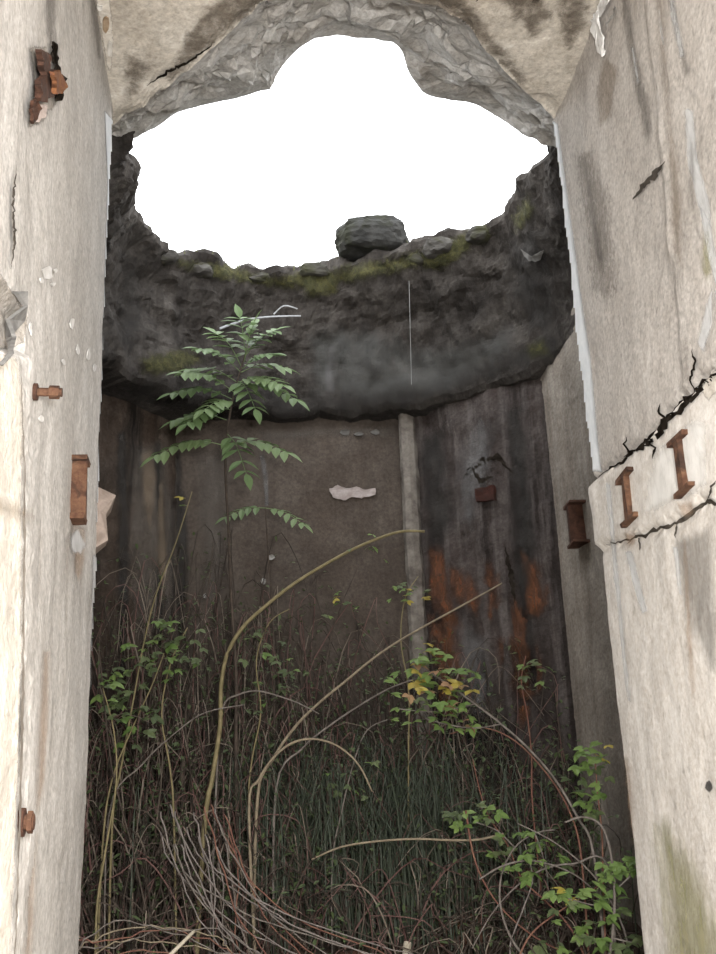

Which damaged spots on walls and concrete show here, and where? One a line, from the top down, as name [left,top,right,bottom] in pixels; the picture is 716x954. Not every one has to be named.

damp [126,61,146,92]
crack [147,42,215,86]
damp [178,0,268,63]
damp [418,0,520,80]
damp [507,0,587,42]
peeling [590,0,616,57]
crack [599,351,716,477]
peeling [329,485,376,500]
crack [606,481,716,550]
corrosion [429,552,497,724]
corrosion [499,558,546,723]